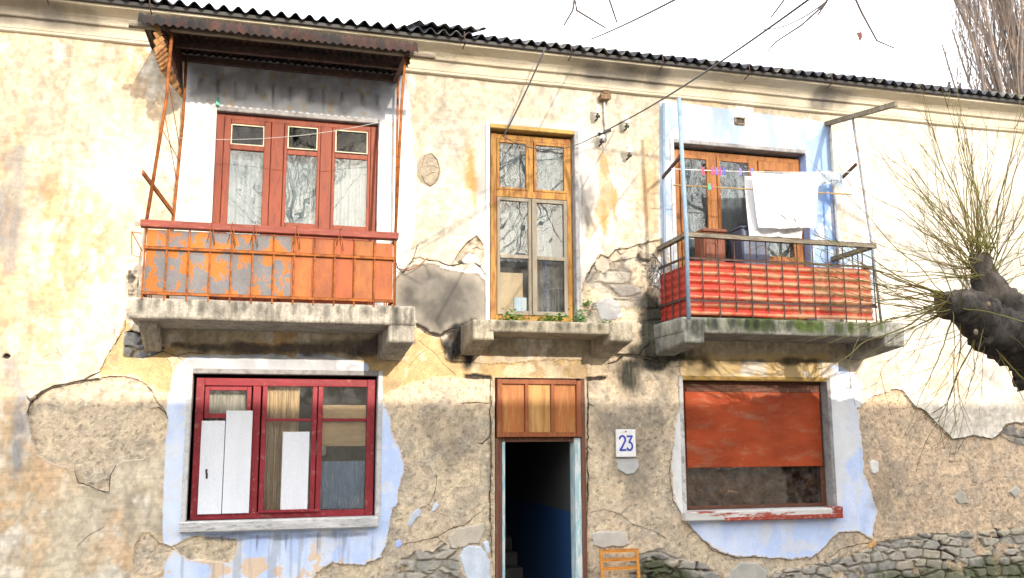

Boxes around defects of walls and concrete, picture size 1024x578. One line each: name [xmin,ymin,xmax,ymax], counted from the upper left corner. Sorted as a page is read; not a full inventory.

spalling [27,316,299,490]
spalling [133,532,237,578]
crack [405,323,492,558]
flaking render [314,235,1024,578]